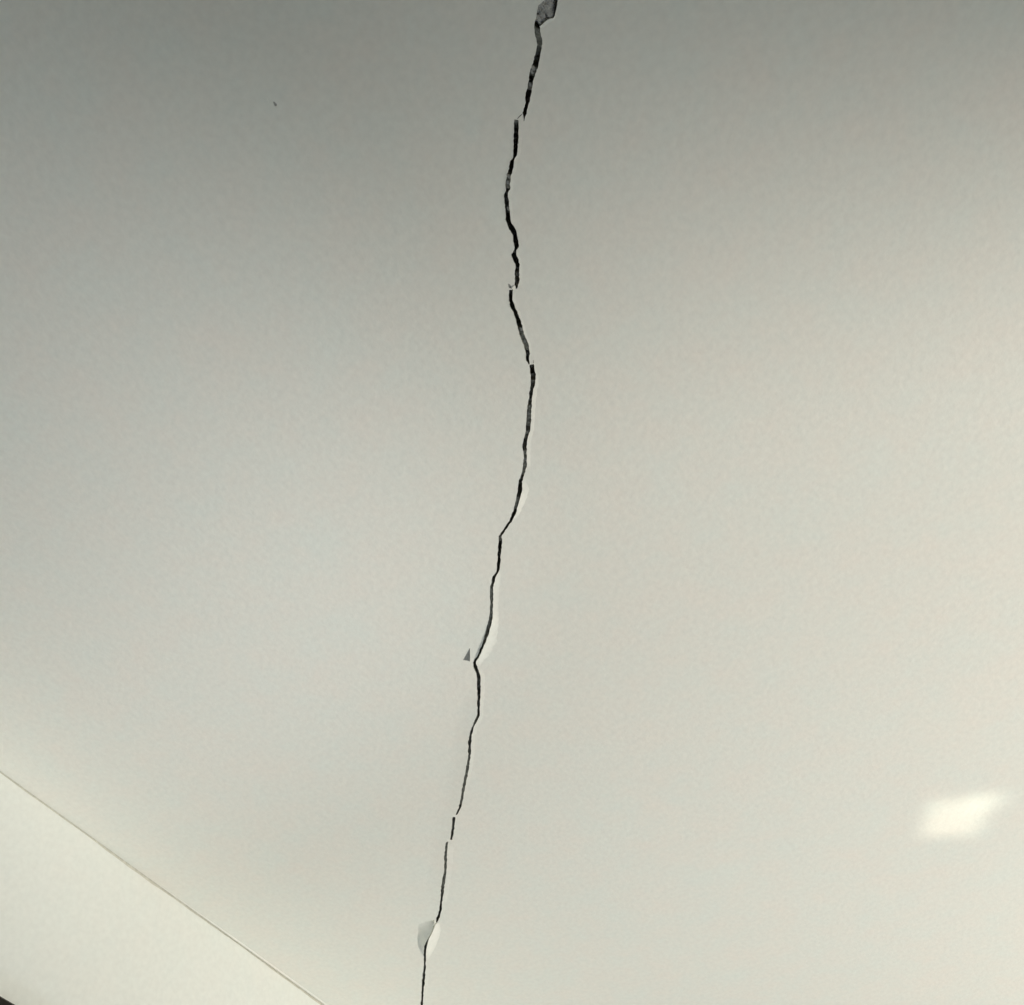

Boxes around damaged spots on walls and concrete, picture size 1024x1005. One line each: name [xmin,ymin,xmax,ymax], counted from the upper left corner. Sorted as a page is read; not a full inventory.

crack [420,22,545,1005]